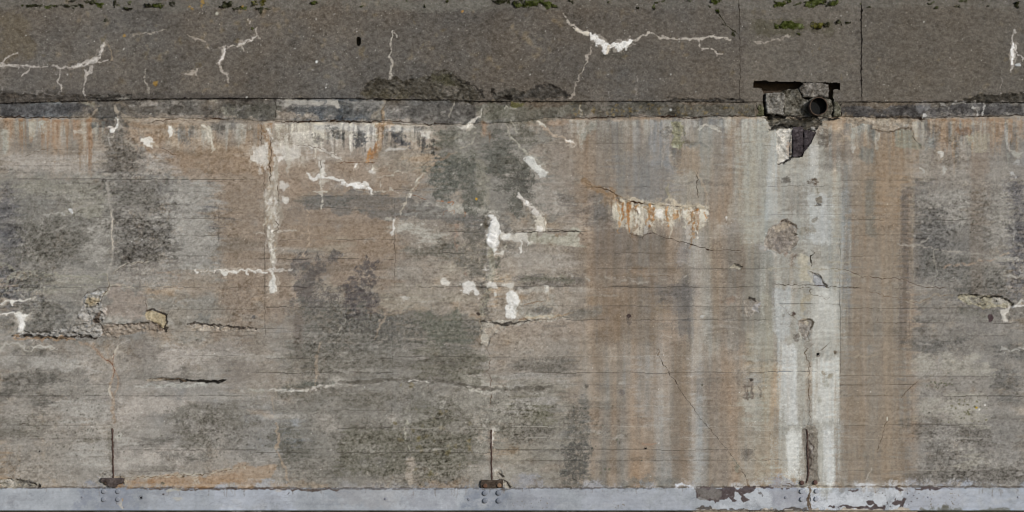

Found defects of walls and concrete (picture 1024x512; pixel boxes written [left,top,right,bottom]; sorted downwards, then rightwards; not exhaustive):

rust [3,115,94,177]
crack [0,13,792,258]
spalling [763,115,923,165]
damp [107,115,603,362]
spalling [763,218,829,288]
peeling [11,259,257,343]
spalling [957,294,1014,310]
crack [657,348,750,486]